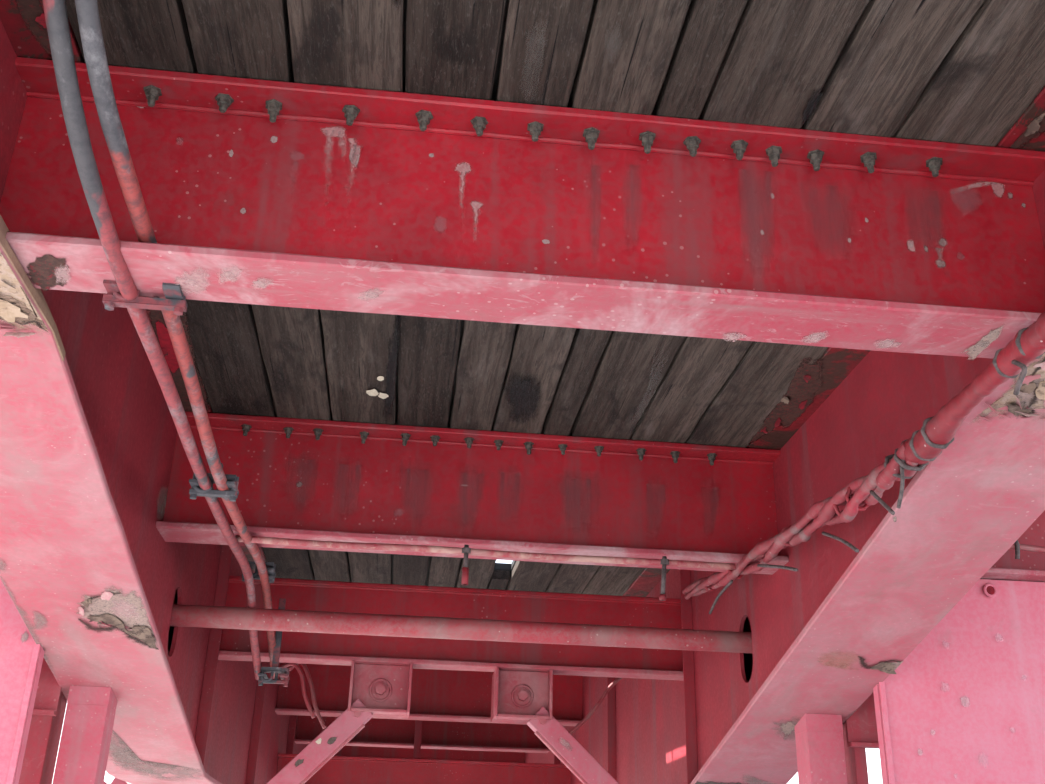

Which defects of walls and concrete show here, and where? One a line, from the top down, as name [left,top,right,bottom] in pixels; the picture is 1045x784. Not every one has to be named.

leakage [325,130,361,174]
peeling [1025,113,1045,137]
peeling [0,252,48,338]
peeling [978,353,1045,422]